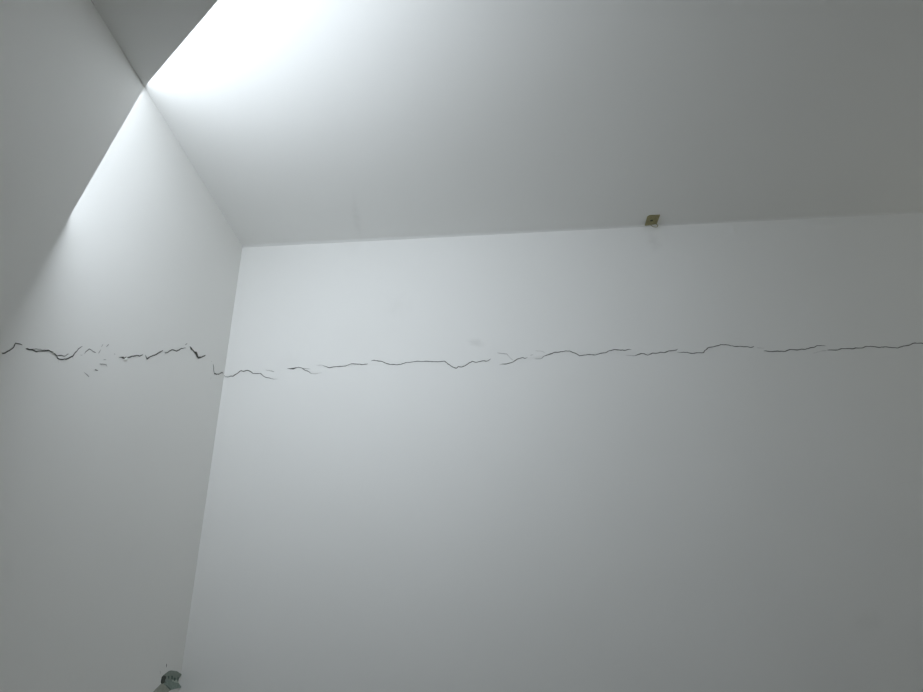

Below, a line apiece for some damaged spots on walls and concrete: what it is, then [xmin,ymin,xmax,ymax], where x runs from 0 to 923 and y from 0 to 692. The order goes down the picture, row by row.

crack [0,343,923,379]